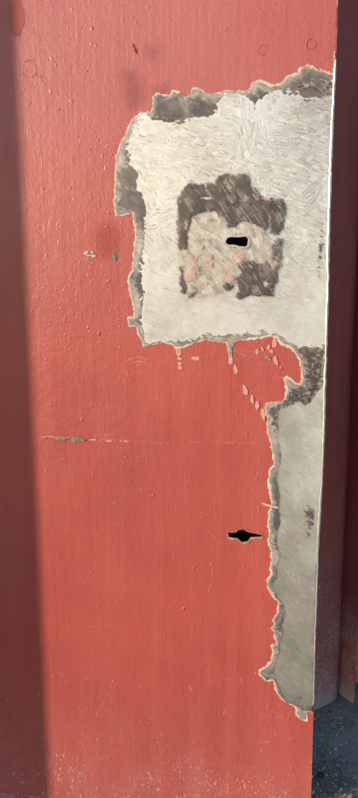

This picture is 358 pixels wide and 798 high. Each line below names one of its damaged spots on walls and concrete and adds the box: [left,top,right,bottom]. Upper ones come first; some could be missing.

peeling [113,45,337,722]